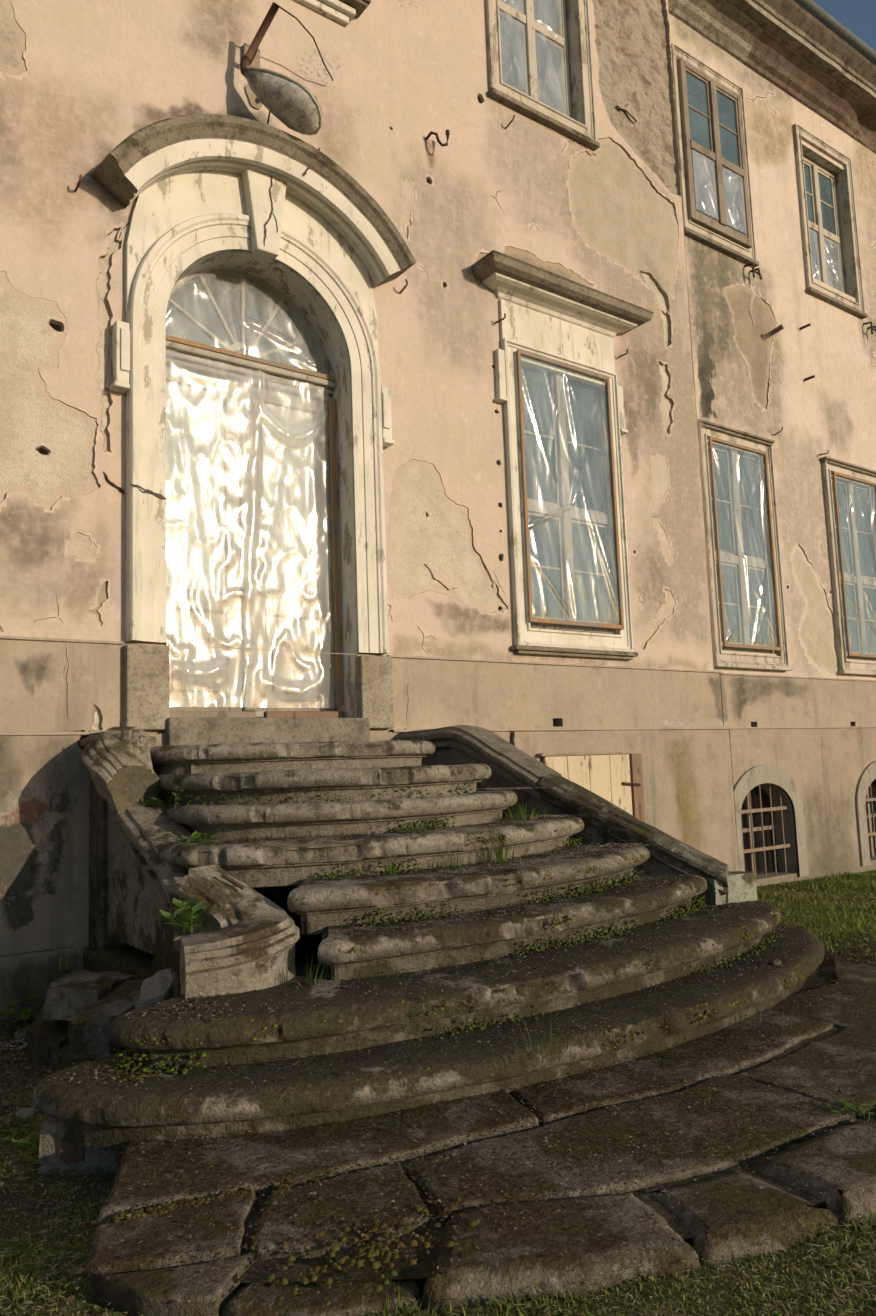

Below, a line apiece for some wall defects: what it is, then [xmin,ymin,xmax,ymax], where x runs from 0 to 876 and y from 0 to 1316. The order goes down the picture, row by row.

flaking render [0,270,102,511]
crack [264,176,278,246]
flaking render [474,246,597,287]
flaking render [568,136,679,315]
damp [690,241,732,417]
flaking render [701,258,779,435]
flaking render [386,458,509,614]
damp [0,787,77,931]